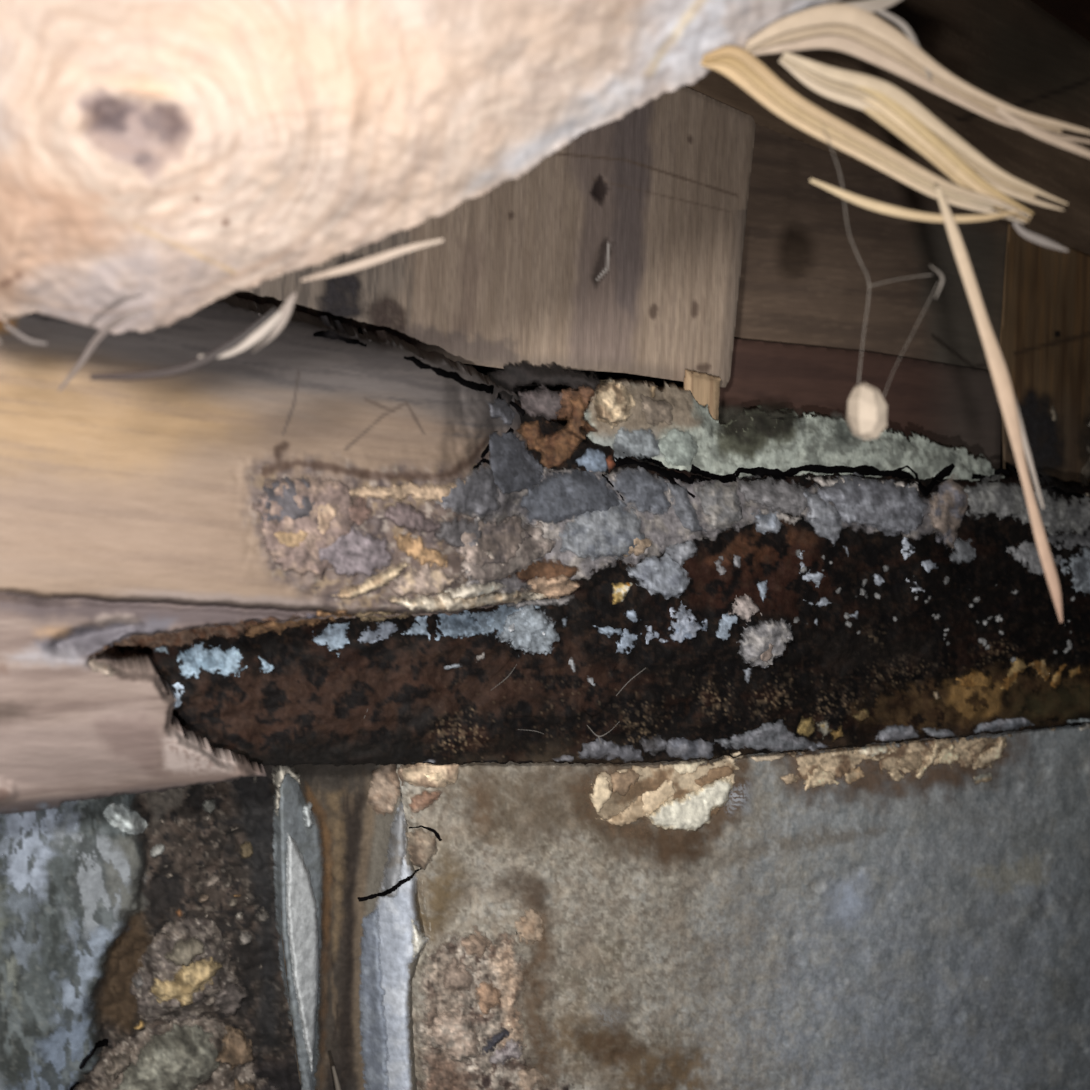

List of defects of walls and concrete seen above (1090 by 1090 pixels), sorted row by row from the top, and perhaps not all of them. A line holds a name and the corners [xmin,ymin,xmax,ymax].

mould [720,408,796,442]
leakage [1010,392,1062,488]
corrosion [88,610,413,677]
corrosion [875,658,1090,729]
peeling [1068,718,1090,731]
spalling [554,717,1034,860]
leakage [1,805,131,1090]
peeling [273,765,325,1090]
spalling [359,760,569,1090]